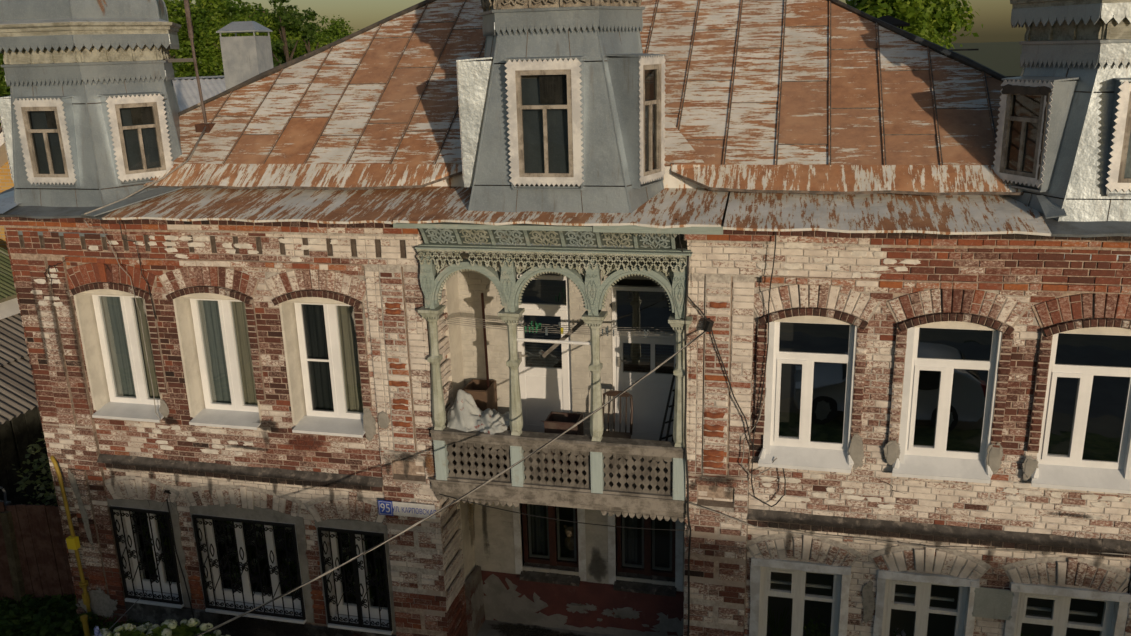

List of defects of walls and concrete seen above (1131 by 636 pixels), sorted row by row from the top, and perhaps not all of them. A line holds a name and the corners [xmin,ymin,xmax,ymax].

peeling [471,574,684,636]